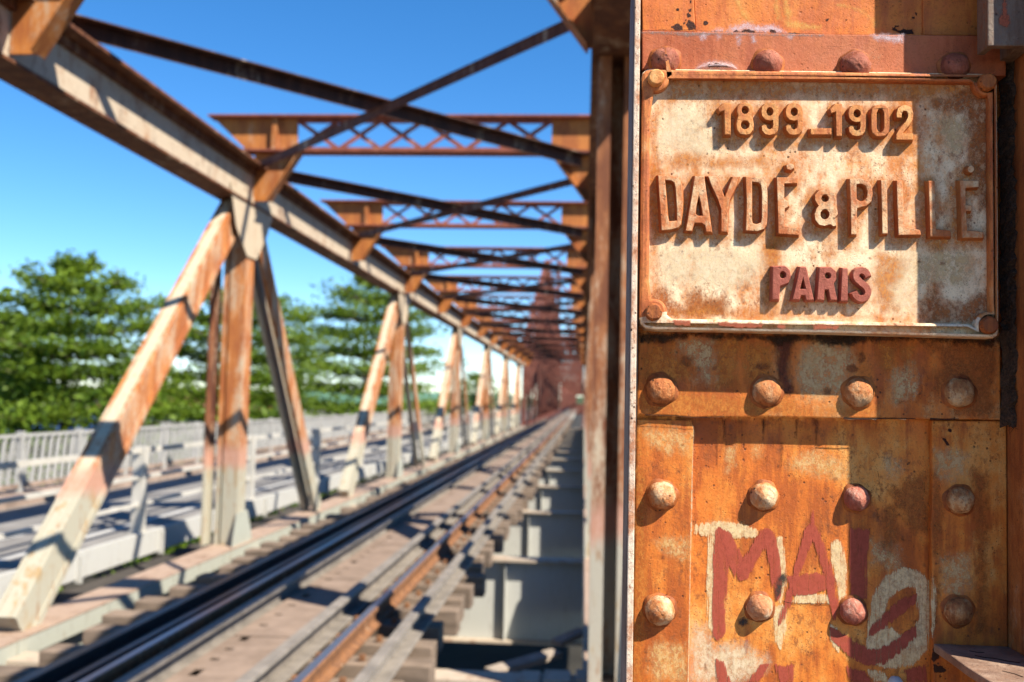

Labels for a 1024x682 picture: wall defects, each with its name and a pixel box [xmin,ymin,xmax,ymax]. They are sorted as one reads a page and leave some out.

rust [671,0,708,30]
rust [642,80,990,438]